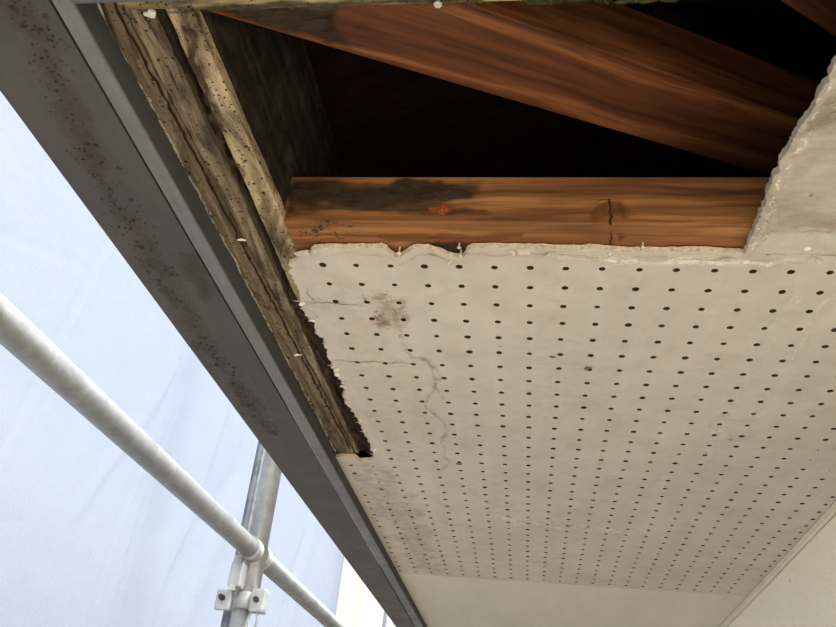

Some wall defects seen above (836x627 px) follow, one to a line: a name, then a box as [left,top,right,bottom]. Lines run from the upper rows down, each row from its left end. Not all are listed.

damp [7,0,189,311]
damp [182,27,245,178]
crack [113,2,351,449]
damp [288,178,476,212]
crack [592,199,613,246]
peeling [544,82,836,267]
damp [287,280,366,451]